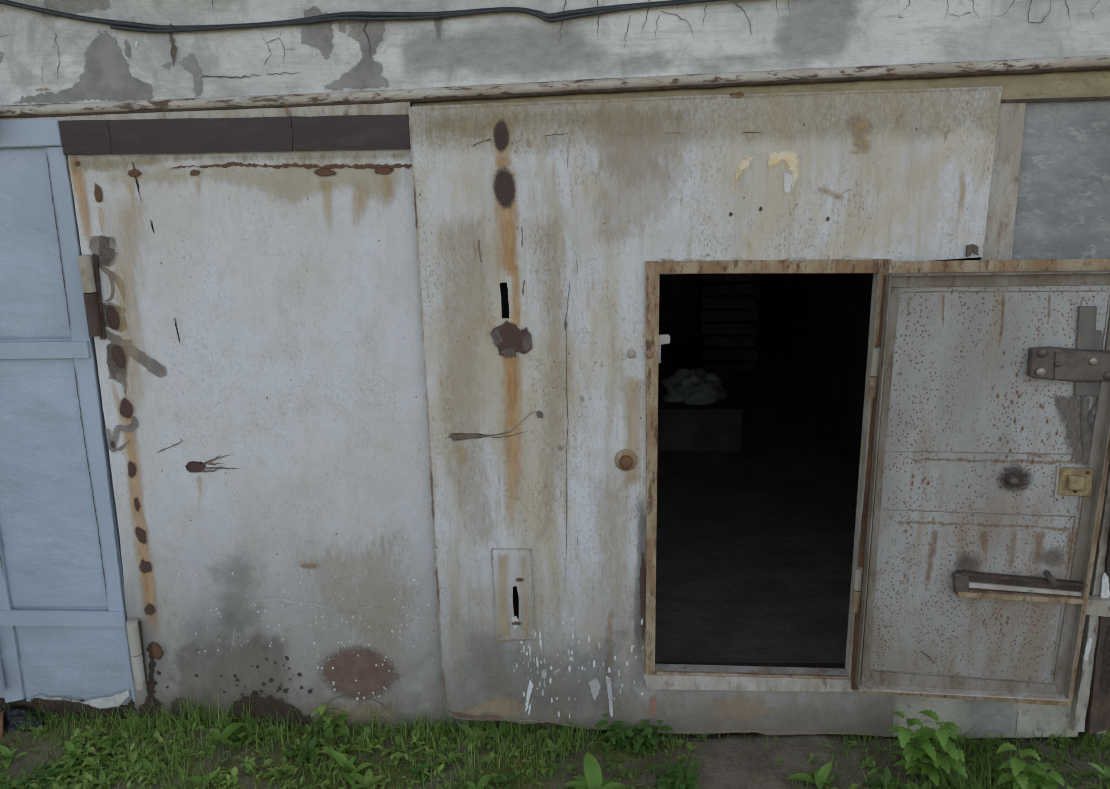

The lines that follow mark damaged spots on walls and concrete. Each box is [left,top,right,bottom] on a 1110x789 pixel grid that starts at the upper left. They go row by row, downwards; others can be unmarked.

peeling [42,0,111,19]
peeling [15,31,153,104]
peeling [161,54,203,96]
peeling [301,6,388,91]
rust [0,66,1110,119]
crack [624,0,707,47]
crack [945,0,1099,23]
rust [490,121,532,502]
rust [71,130,418,618]
rust [139,642,169,719]
leakage [220,656,313,728]
rust [317,640,398,720]